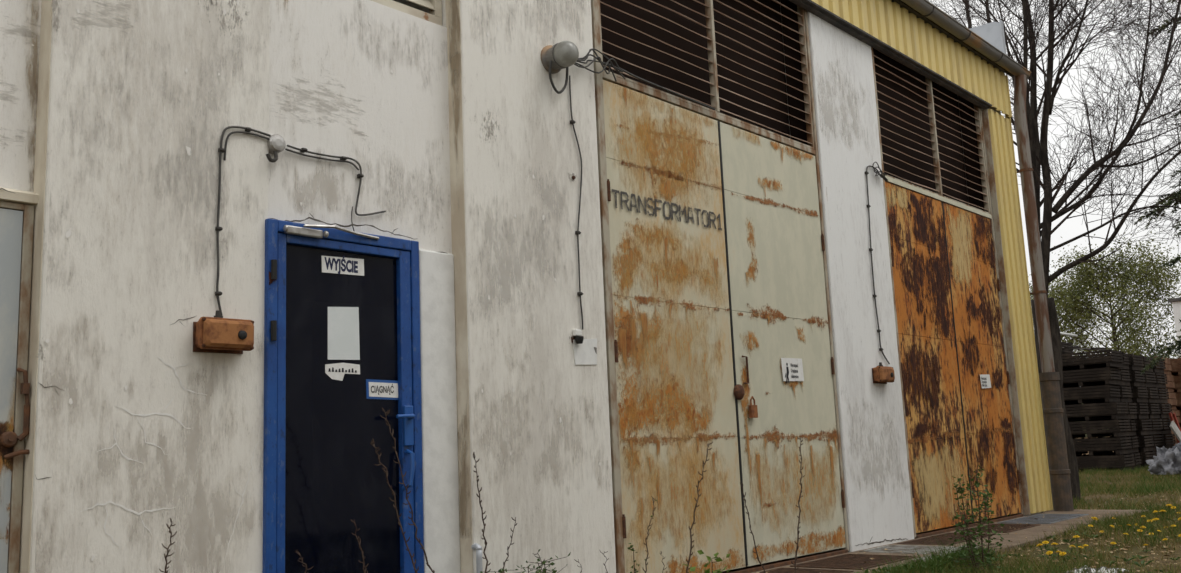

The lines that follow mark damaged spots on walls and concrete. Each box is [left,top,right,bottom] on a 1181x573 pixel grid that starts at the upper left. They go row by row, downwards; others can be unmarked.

rust [0,414,15,474]
rust [613,218,838,539]
rust [666,526,846,573]
rust [885,188,1019,524]